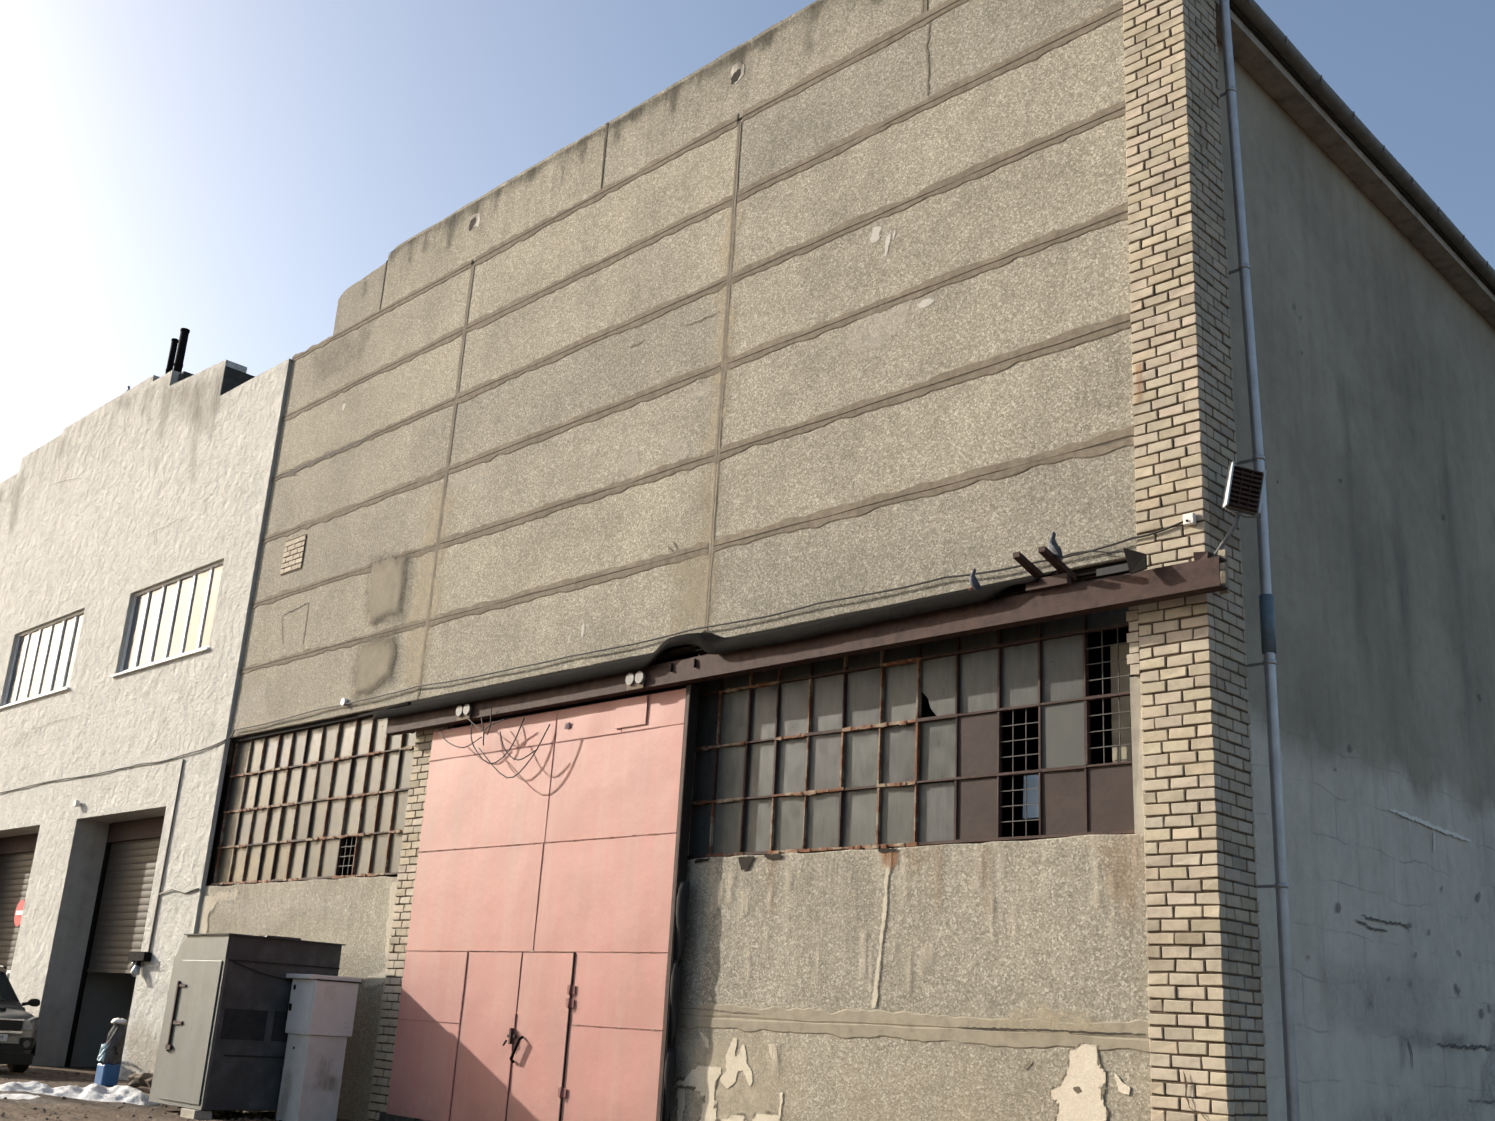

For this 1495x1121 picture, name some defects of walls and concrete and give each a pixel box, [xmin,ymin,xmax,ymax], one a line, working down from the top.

damp [860,853,891,1009]
peeling [676,1032,783,1121]
peeling [1050,1043,1130,1121]